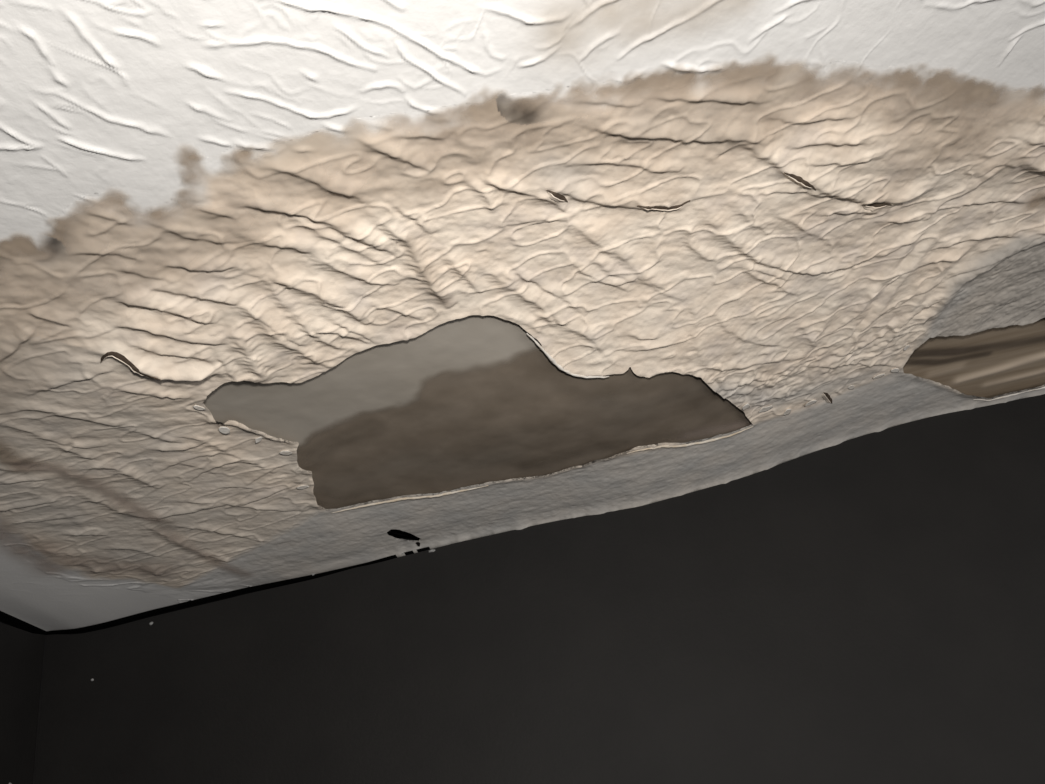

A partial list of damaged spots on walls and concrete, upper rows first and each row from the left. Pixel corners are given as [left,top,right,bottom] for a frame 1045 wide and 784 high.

peeling [193,315,817,513]
peeling [873,318,1045,401]